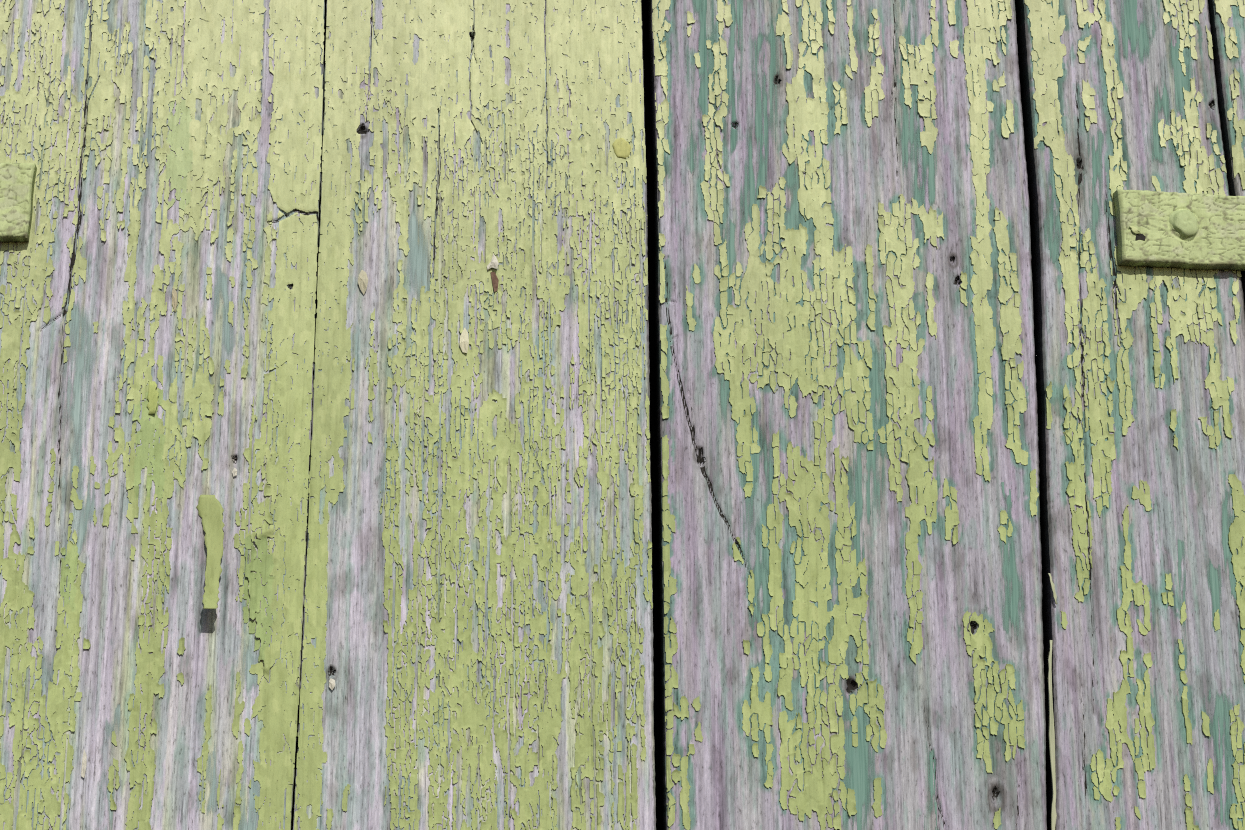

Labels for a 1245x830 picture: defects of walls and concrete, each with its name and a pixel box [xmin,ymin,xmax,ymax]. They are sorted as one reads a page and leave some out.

peeling [196,495,285,830]
crack [268,209,319,223]
crack [664,263,750,574]
peeling [776,0,885,189]
peeling [732,194,944,830]
peeling [899,0,959,154]
peeling [962,611,1025,773]
peeling [973,206,1039,517]
peeling [1075,0,1127,216]
peeling [1045,174,1172,602]
peeling [1090,479,1211,830]
peeling [1158,0,1245,196]